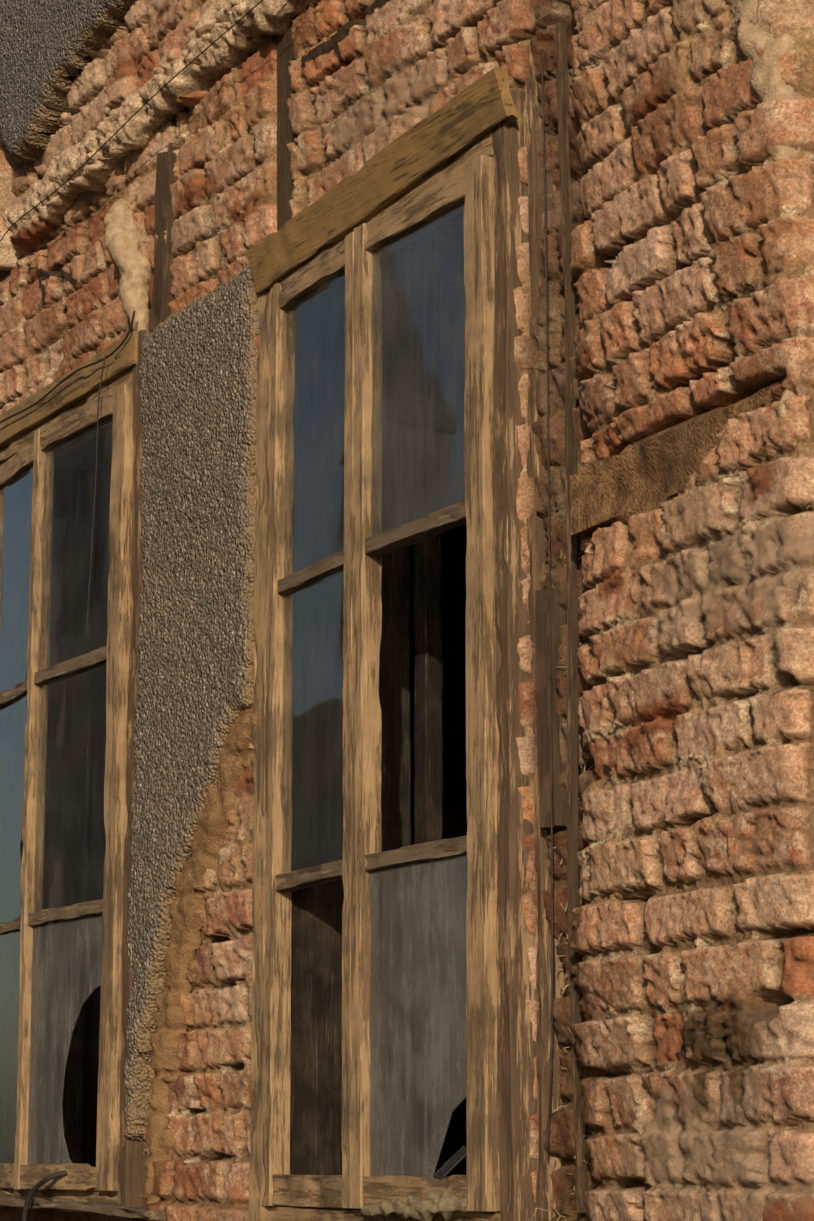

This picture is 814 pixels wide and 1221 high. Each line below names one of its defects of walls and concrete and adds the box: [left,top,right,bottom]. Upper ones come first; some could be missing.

spalling [109,53,142,84]
spalling [176,171,216,210]
spalling [227,190,259,226]